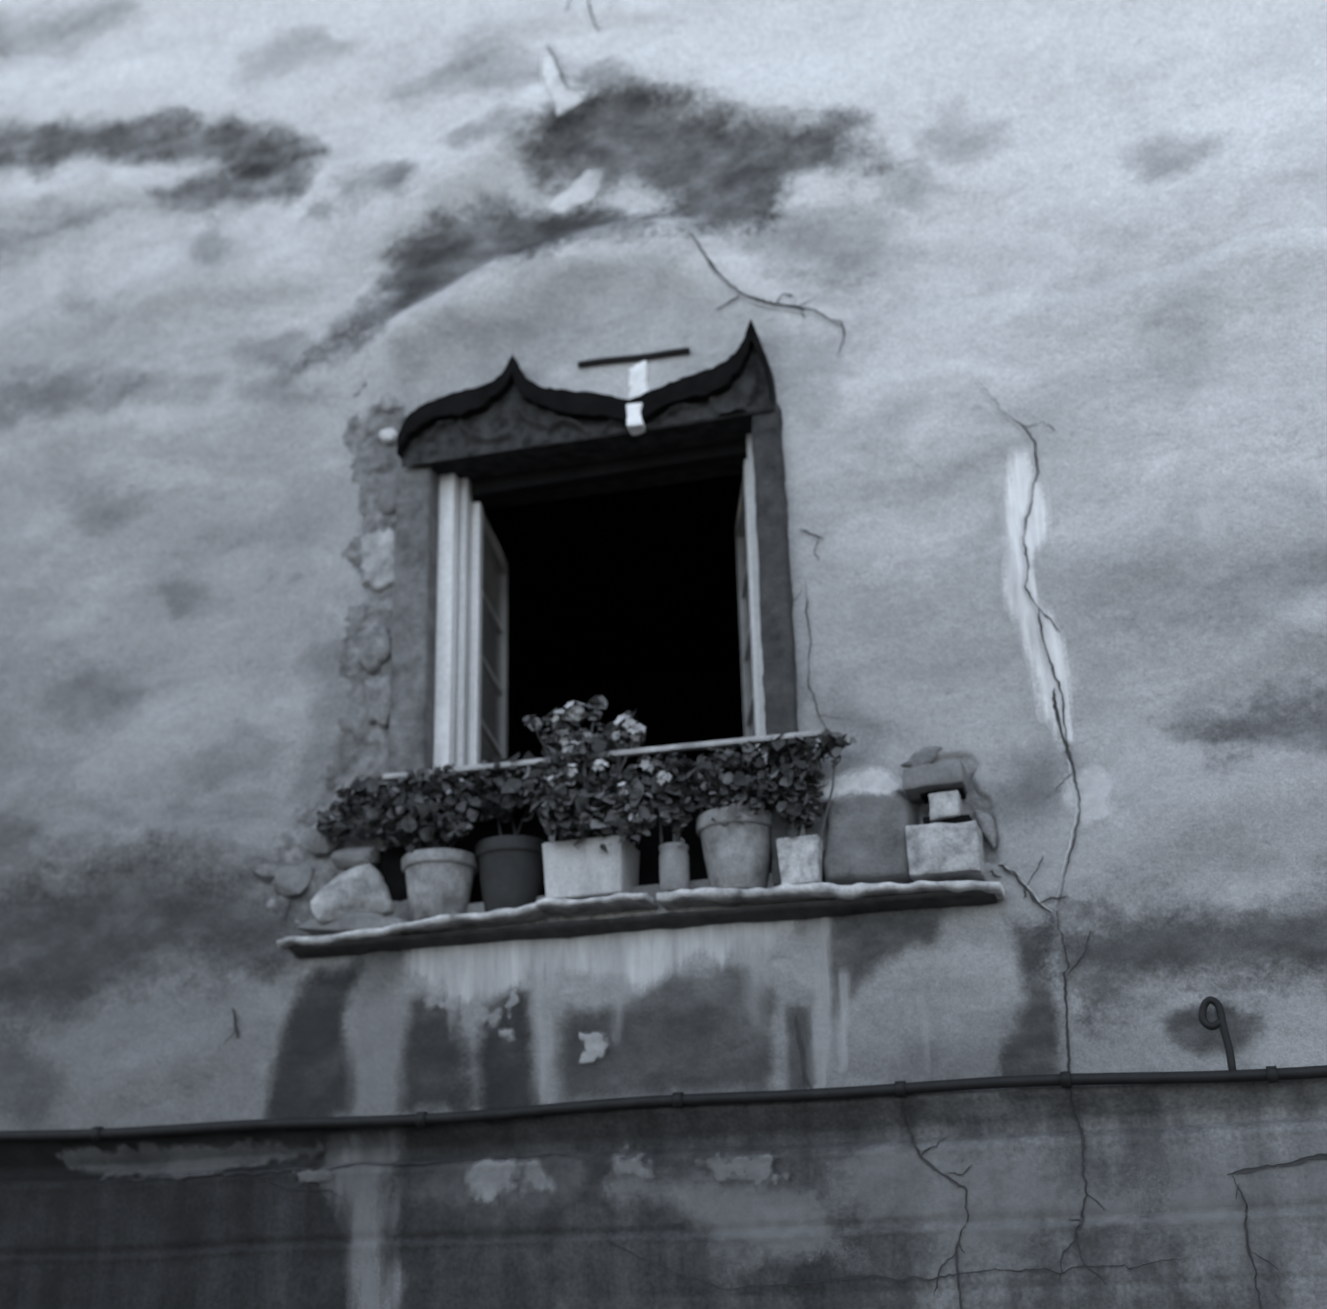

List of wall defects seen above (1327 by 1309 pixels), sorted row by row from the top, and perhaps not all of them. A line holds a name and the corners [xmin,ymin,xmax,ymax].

crack [547,43,587,91]
damp [0,112,327,199]
damp [303,54,865,363]
crack [691,233,845,357]
flaking render [256,393,420,935]
crack [604,378,1185,1309]
damp [267,964,359,1119]
peeling [579,1032,608,1063]
damp [398,905,798,1112]
peeling [56,1139,331,1182]
peeling [465,1158,555,1203]
crack [1227,1153,1327,1309]